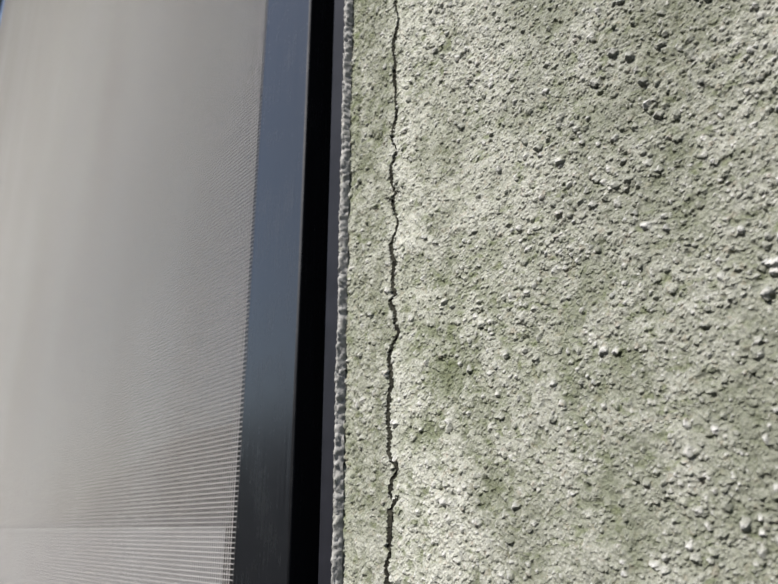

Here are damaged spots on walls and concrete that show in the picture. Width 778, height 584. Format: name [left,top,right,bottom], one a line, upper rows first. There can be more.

crack [384,0,401,584]